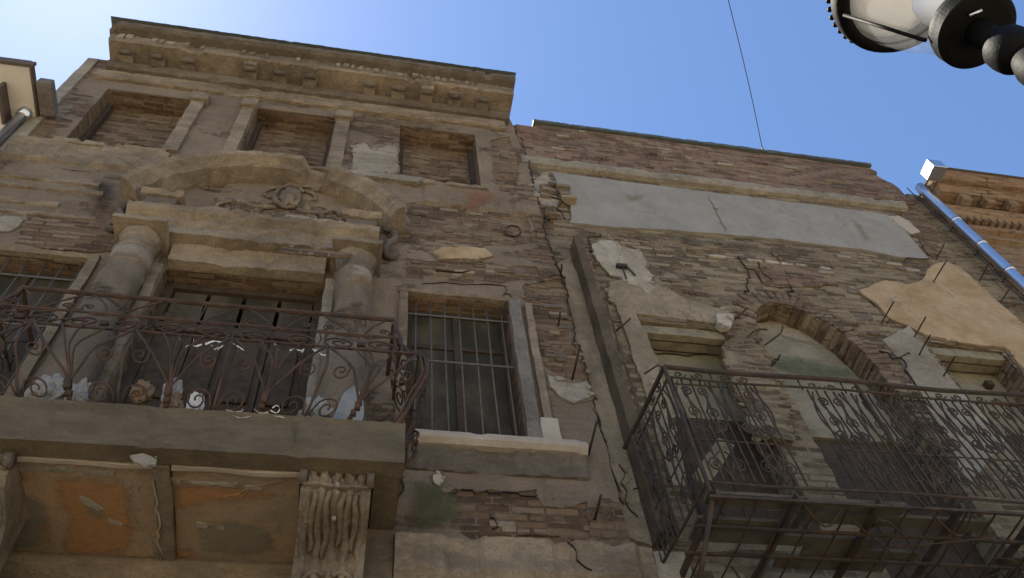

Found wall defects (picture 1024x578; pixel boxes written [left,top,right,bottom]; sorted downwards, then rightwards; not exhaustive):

peeling [350,142,423,188]
flaking render [407,138,561,261]
crack [737,256,794,297]
peeling [855,204,1024,375]
flaking render [520,279,595,405]
spalling [589,240,796,445]
flaking render [431,471,590,541]
crack [615,464,638,518]
crack [567,541,592,571]